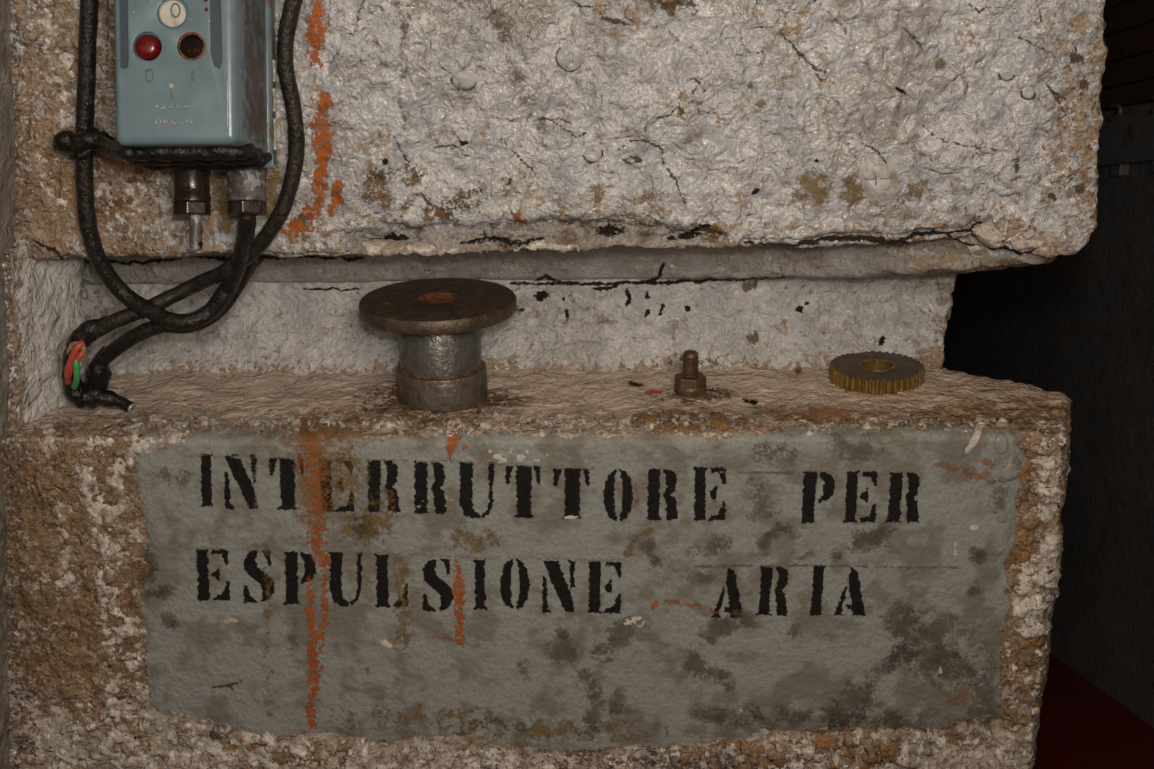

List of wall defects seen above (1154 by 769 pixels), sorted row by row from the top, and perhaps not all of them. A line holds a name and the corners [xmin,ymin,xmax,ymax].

corrosion [305,0,329,70]
corrosion [282,91,345,238]
crack [32,238,232,266]
crack [262,255,364,292]
crack [509,262,795,291]
crack [744,220,1037,255]
corrosion [468,388,532,415]
leakage [324,447,397,545]
corrosion [270,360,484,730]
leakage [833,524,892,558]
leakage [337,629,668,741]
leakage [780,602,1002,734]